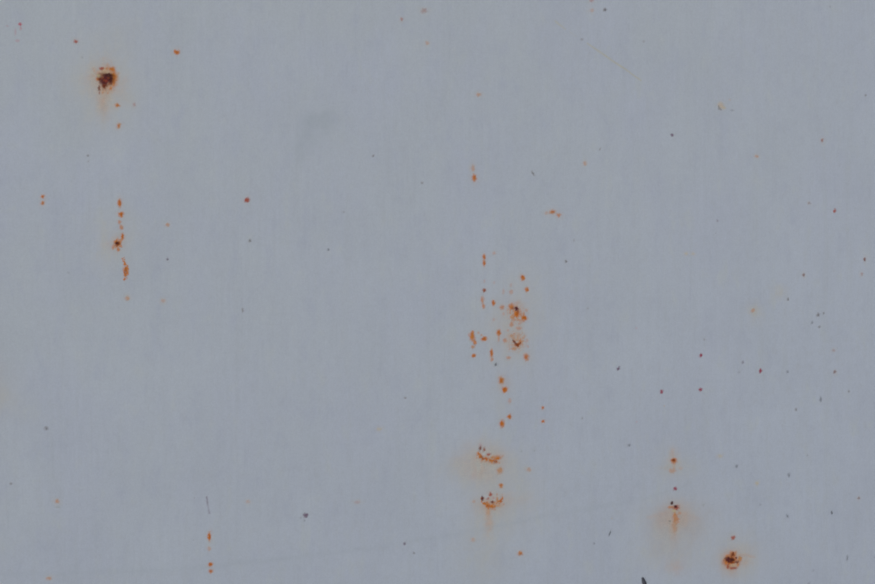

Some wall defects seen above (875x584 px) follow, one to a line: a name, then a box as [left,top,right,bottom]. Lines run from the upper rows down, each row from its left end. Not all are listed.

rust [444,234,569,428]
rust [607,470,792,584]